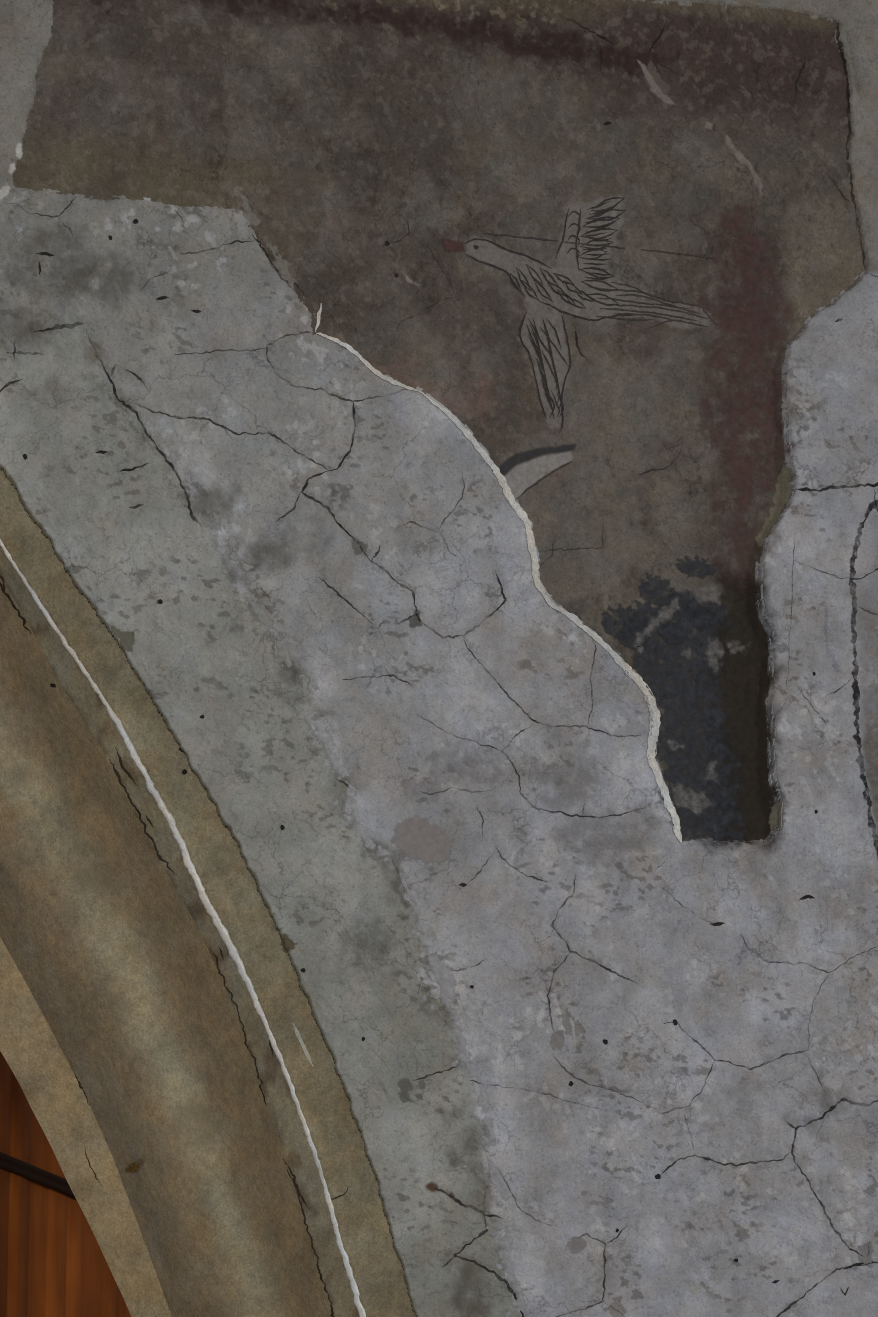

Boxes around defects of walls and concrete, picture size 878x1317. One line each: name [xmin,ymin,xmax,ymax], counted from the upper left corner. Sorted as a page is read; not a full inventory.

flaking render [636,59,674,104]
flaking render [705,121,763,198]
crack [103,367,421,621]
spalling [755,461,796,546]
crack [797,482,878,511]
spalling [111,626,135,652]
spalling [315,303,682,843]
crack [449,635,636,818]
spalling [769,800,784,831]
crack [476,791,629,1023]
crack [661,947,878,1317]
crack [435,1185,625,1317]